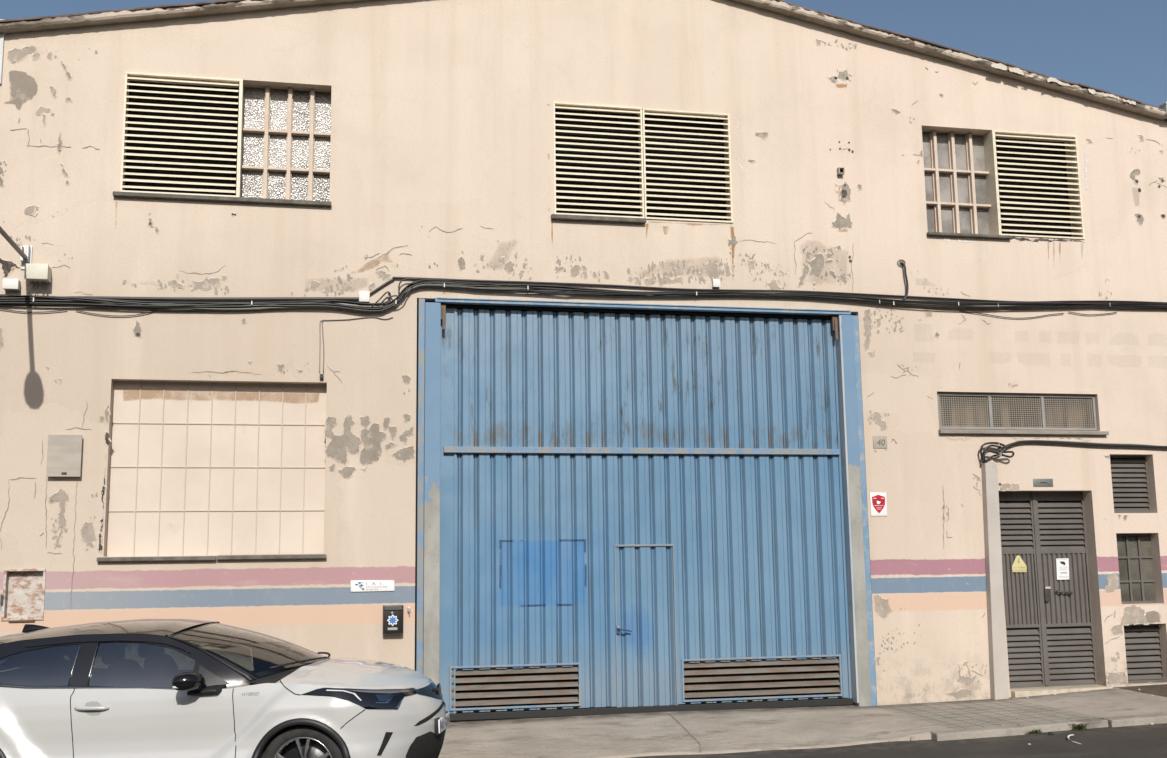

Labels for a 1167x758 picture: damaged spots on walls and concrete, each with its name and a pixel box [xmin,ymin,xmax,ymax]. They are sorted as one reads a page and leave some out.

peeling [6,45,79,81]
peeling [36,85,73,127]
peeling [627,182,863,292]
spalling [0,258,20,278]
peeling [457,240,532,280]
peeling [554,255,610,282]
peeling [324,414,416,479]
peeling [47,489,98,551]
peeling [1105,605,1161,686]